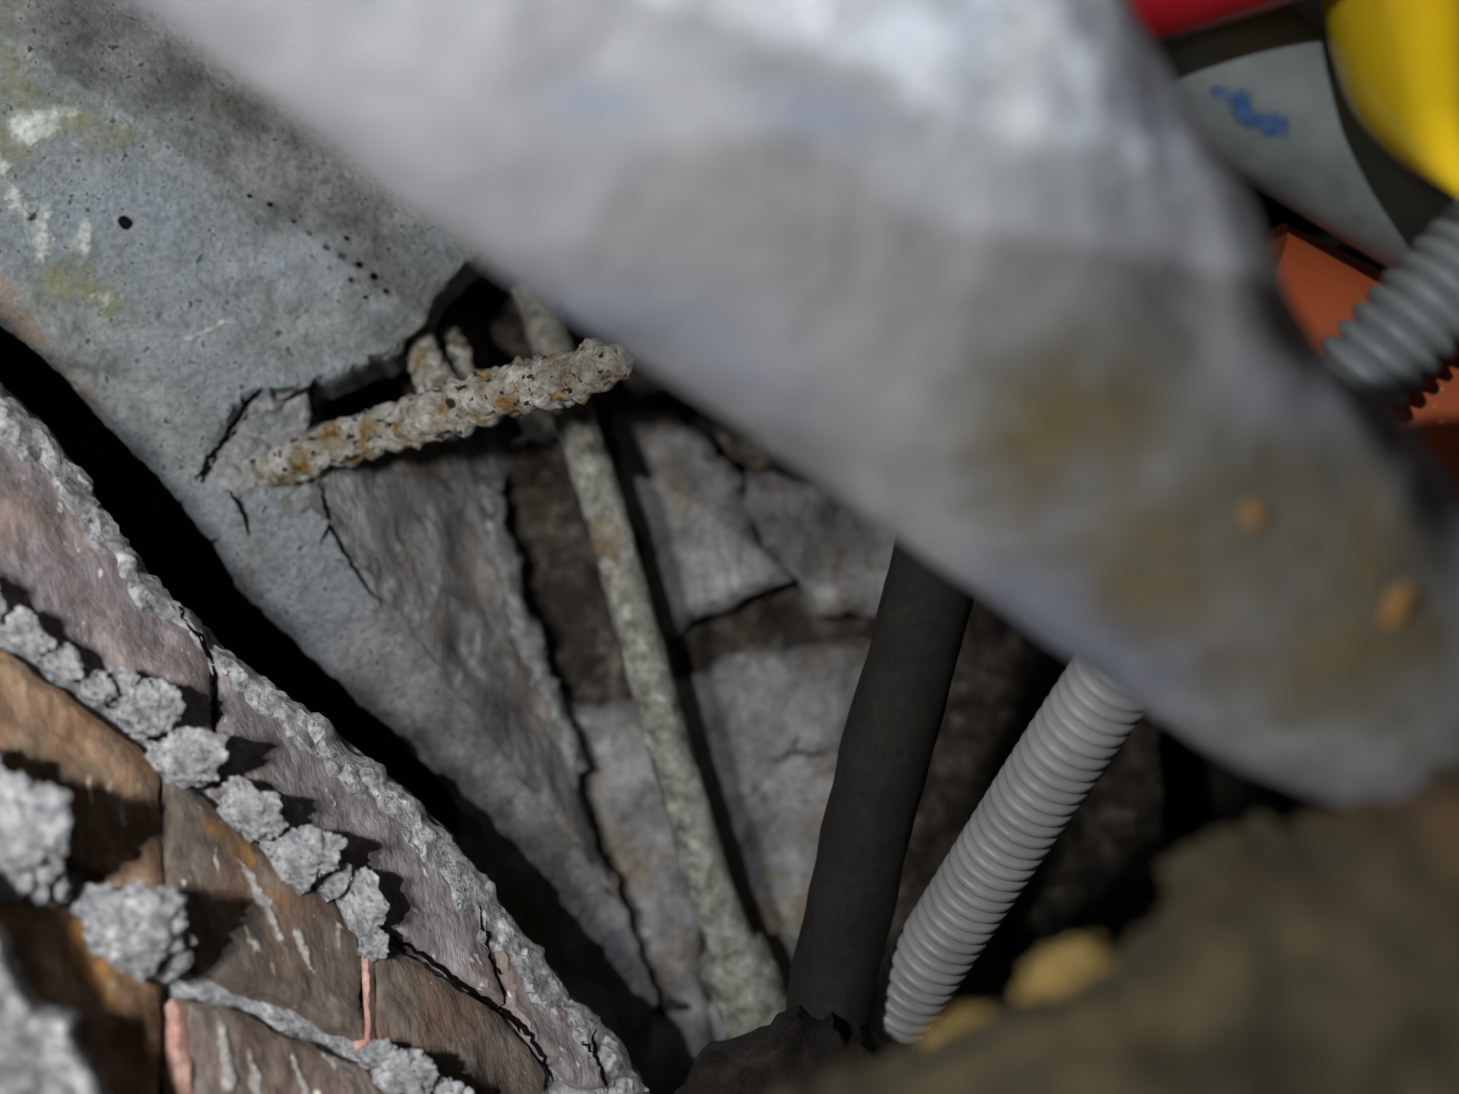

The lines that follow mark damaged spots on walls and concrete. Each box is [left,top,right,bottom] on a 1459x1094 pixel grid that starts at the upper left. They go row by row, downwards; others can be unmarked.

crack [194,384,316,543]
spalling [210,304,635,519]